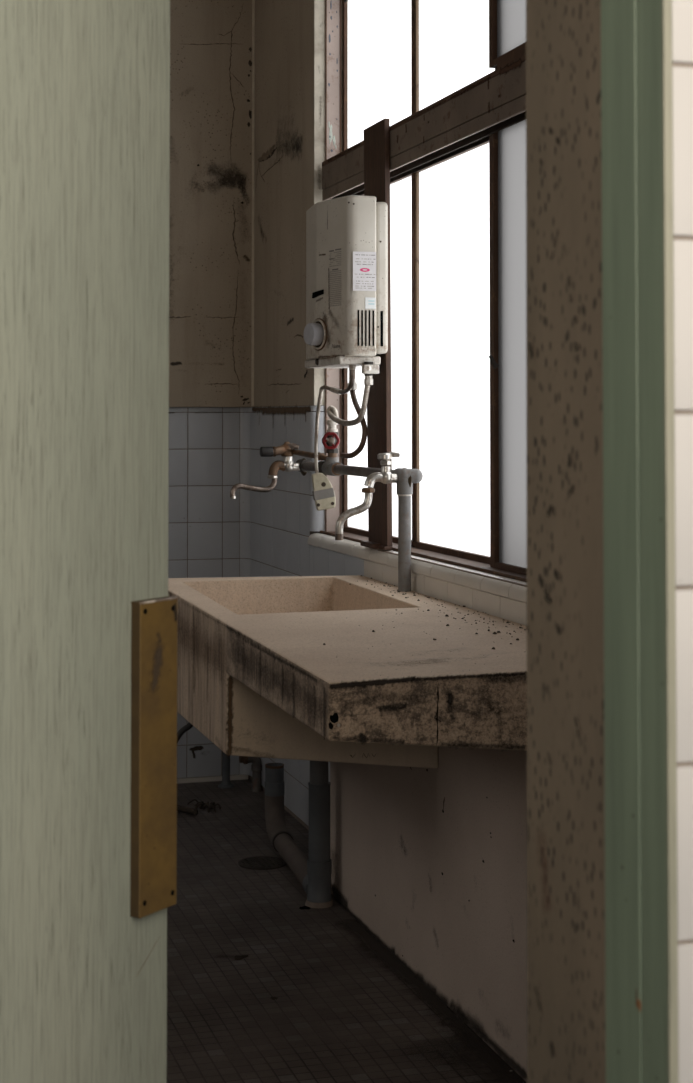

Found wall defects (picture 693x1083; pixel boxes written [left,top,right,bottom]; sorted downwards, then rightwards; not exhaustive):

crack [169,3,284,393]
leakage [174,603,527,744]